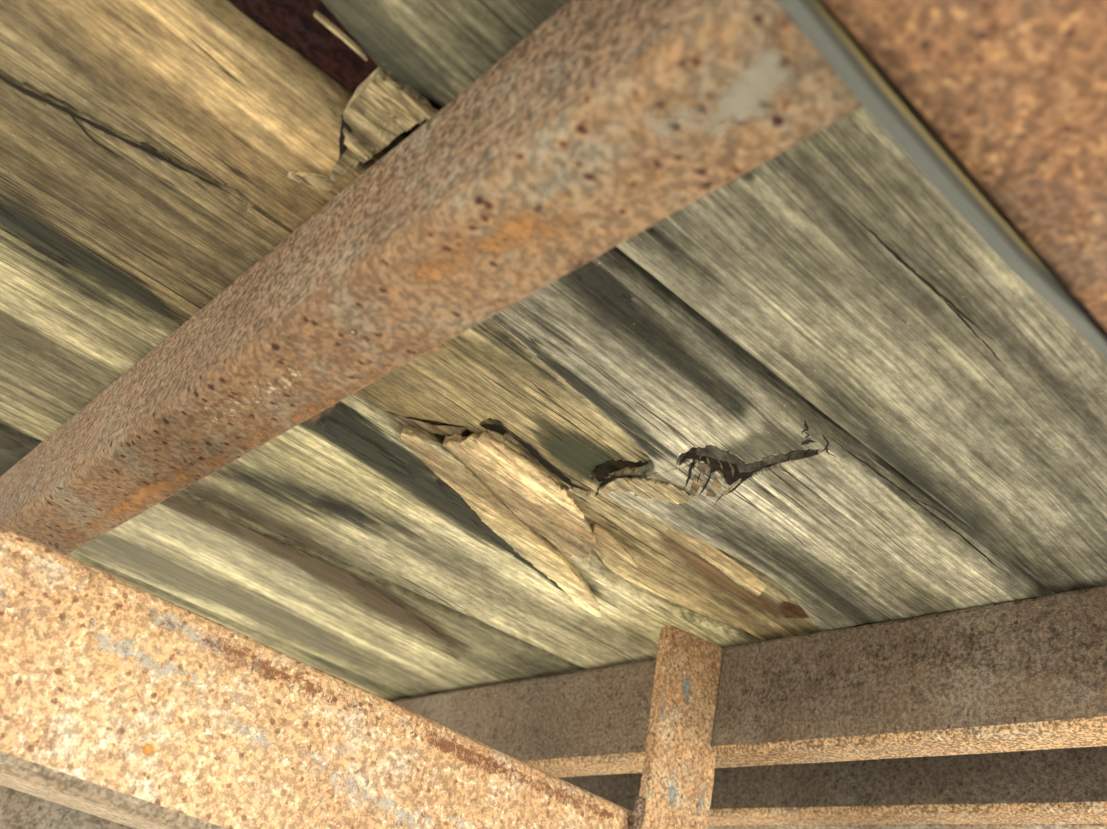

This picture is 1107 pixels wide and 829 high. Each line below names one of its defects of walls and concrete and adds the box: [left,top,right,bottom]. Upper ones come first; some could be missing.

corrosion [229,0,378,93]
crack [0,75,247,204]
peeling [288,10,438,191]
corrosion [414,215,569,283]
corrosion [70,431,271,540]
peeling [594,445,804,505]
crack [684,461,745,508]
crack [801,421,1020,585]
peeling [668,525,766,597]